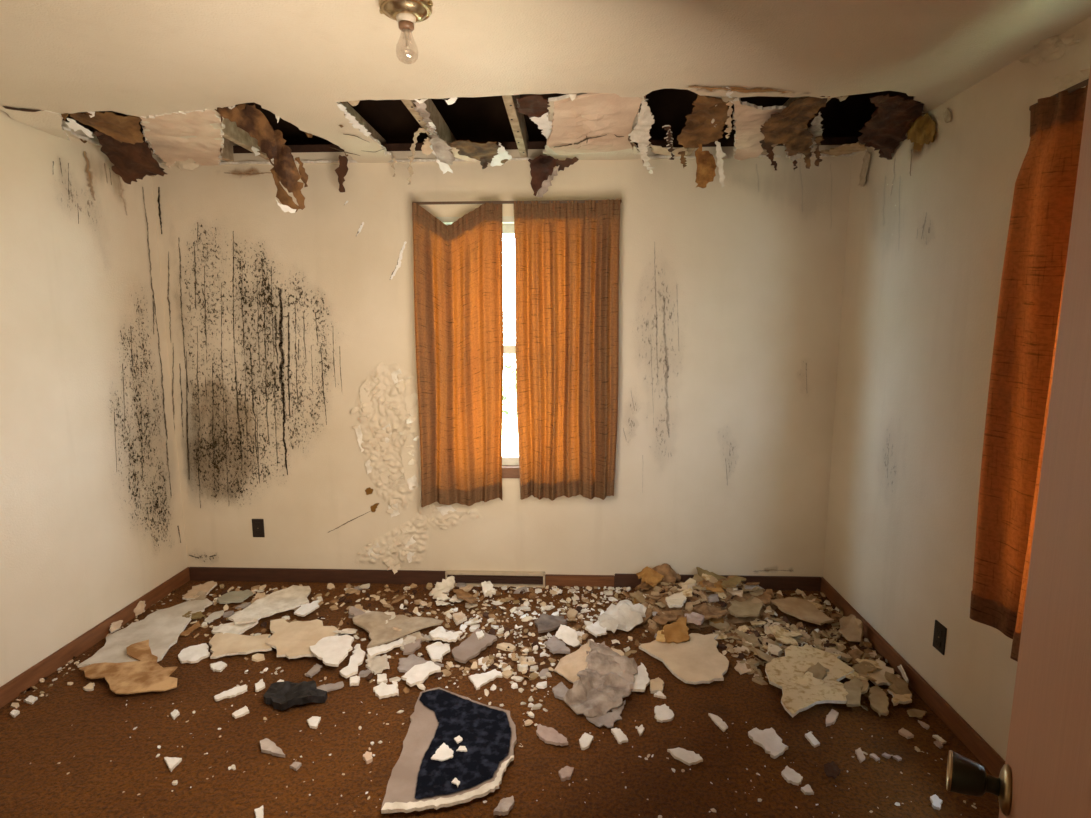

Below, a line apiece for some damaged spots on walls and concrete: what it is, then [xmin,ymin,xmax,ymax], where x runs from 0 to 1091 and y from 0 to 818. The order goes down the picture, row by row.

mould [108,187,342,547]